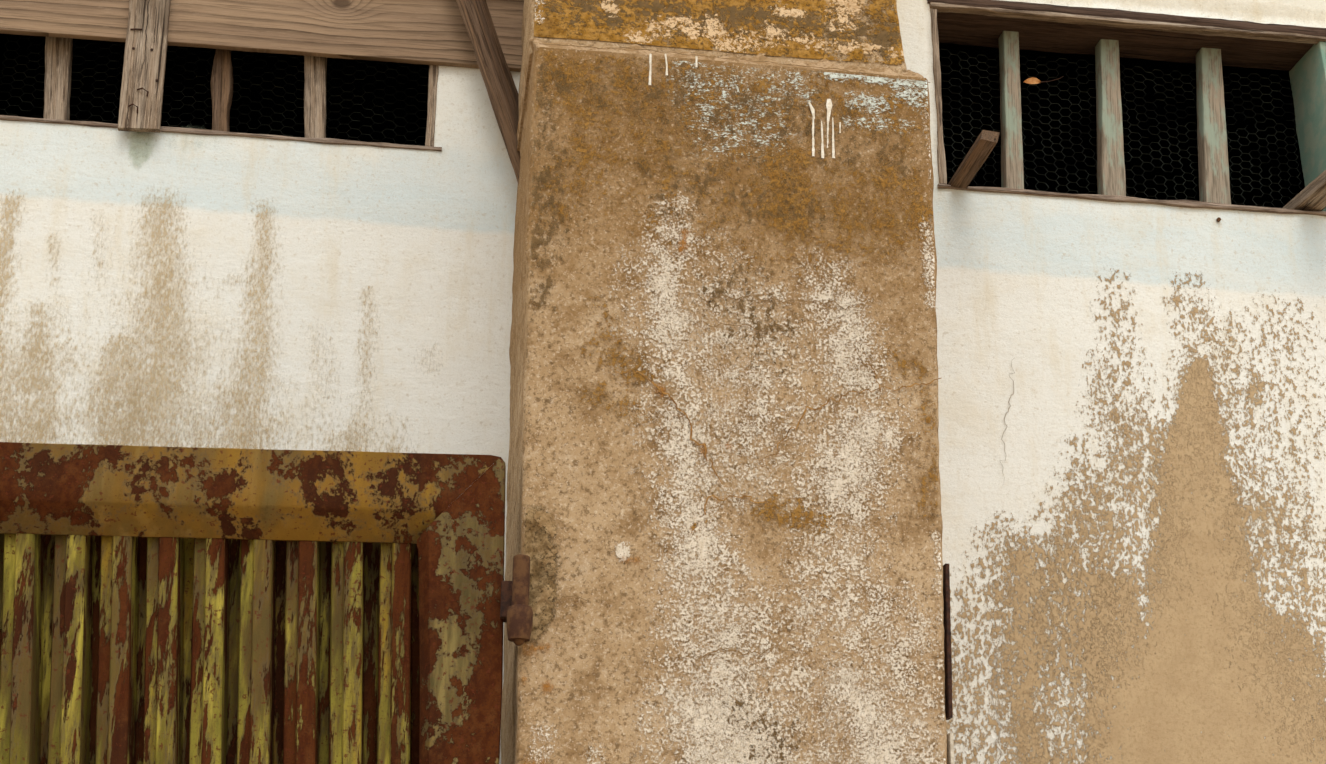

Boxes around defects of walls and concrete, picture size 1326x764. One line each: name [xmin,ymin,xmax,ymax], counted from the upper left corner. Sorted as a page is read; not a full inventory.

damp [530,54,924,321]
damp [0,195,283,449]
damp [697,250,810,373]
crack [681,293,875,332]
crack [615,369,772,515]
crack [760,347,941,461]
crack [678,647,795,659]
damp [723,682,806,763]